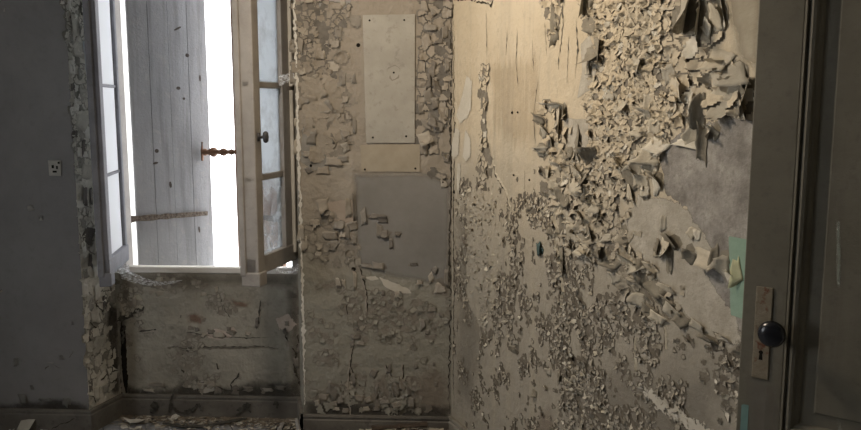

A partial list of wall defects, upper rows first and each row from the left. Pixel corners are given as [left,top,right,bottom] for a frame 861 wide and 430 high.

peeling [59,0,286,410]
peeling [275,0,755,430]